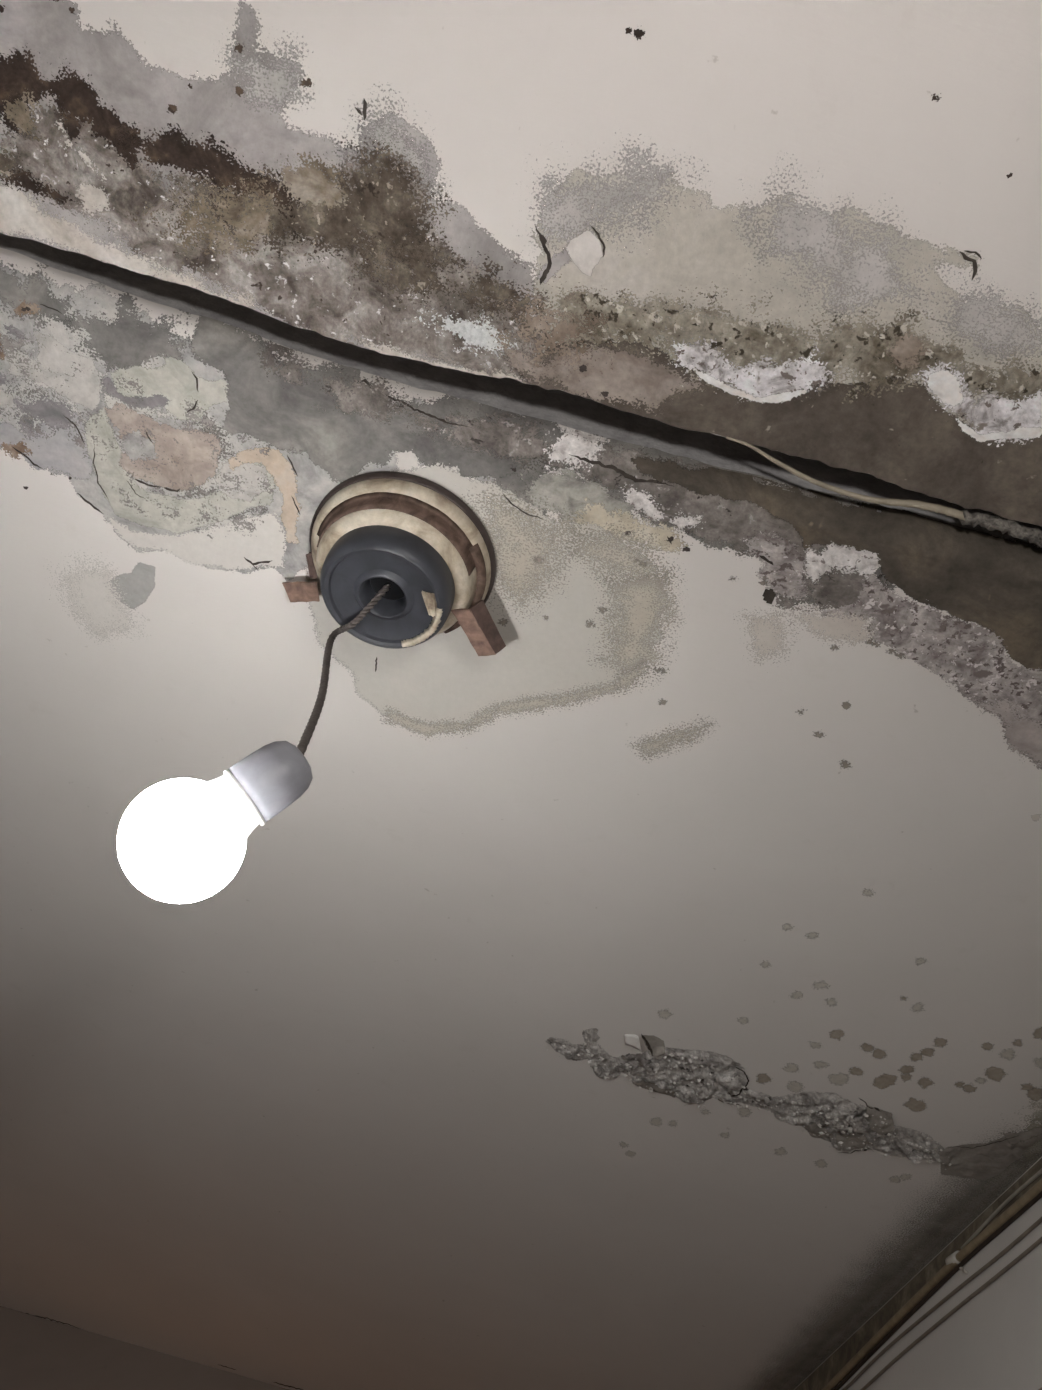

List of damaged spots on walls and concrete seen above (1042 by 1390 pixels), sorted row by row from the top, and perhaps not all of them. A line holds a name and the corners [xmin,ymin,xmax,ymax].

peeling [0,260,400,580]
spalling [421,591,437,617]
damp [0,0,1042,447]
flaking render [0,99,1042,527]
crack [0,226,1042,546]
damp [189,316,1042,770]
spalling [631,456,1042,671]
damp [756,1030,948,1112]
damp [955,1027,1042,1093]
damp [751,1083,1042,1390]